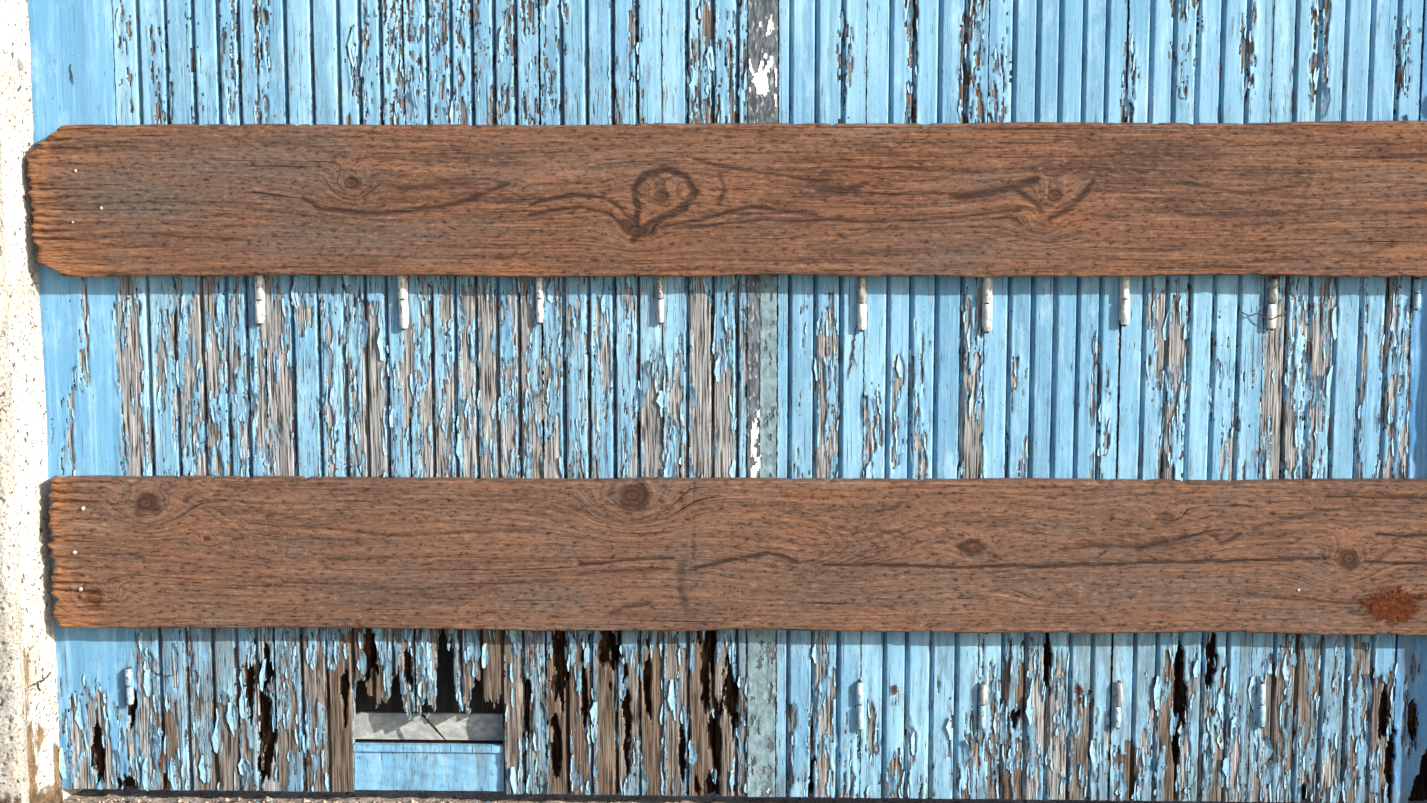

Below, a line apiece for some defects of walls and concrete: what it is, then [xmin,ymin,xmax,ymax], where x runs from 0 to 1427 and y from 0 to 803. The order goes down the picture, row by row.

peeling [149,0,204,125]
peeling [219,0,276,125]
peeling [905,0,919,123]
peeling [958,0,1012,123]
peeling [113,274,840,479]
peeling [863,321,935,480]
peeling [957,277,984,479]
peeling [1144,276,1192,479]
peeling [1208,275,1338,481]
peeling [1354,276,1414,478]
rust [1360,583,1427,627]
peeling [59,627,1420,803]